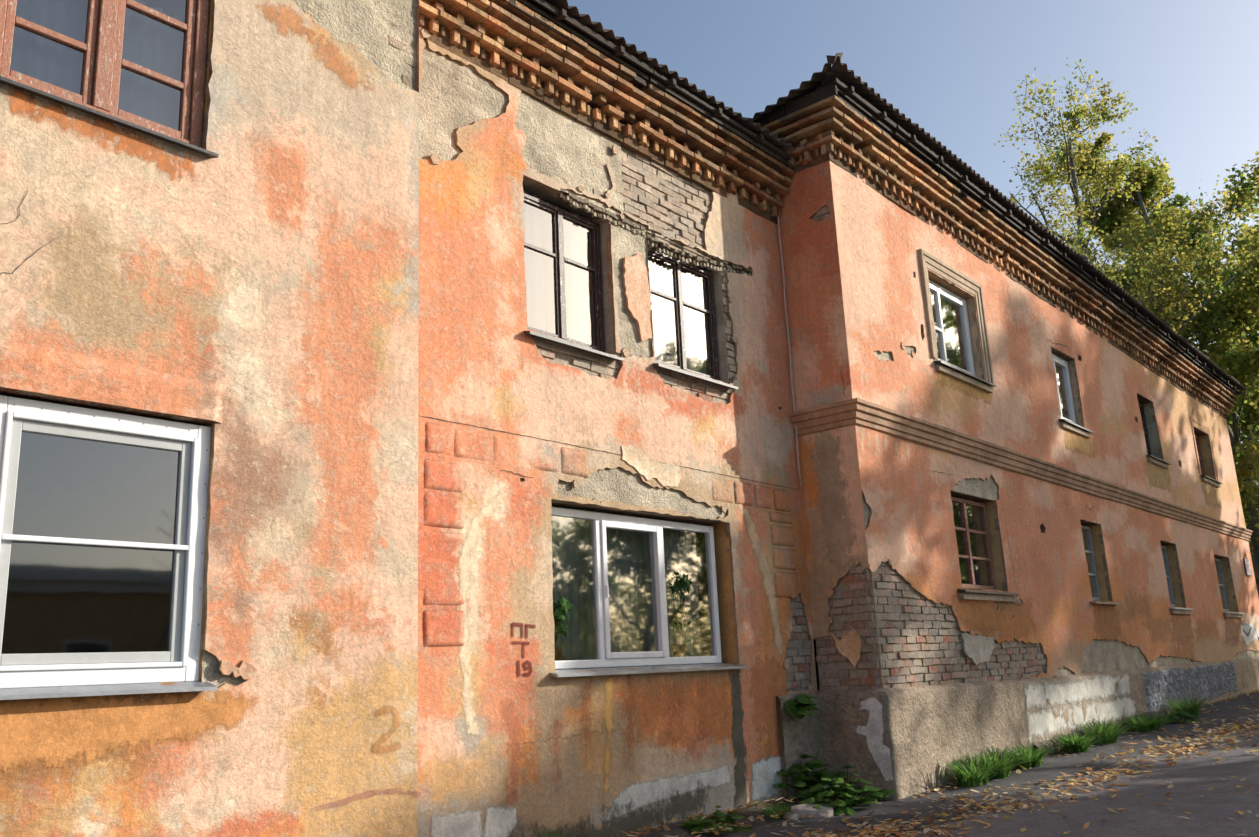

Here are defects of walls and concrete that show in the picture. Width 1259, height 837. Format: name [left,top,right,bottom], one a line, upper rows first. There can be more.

flaking render [291,0,739,405]
crack [0,236,60,275]
flaking render [556,446,728,526]
flaking render [202,650,258,687]
flaking render [783,559,1200,781]
leakage [0,690,259,776]